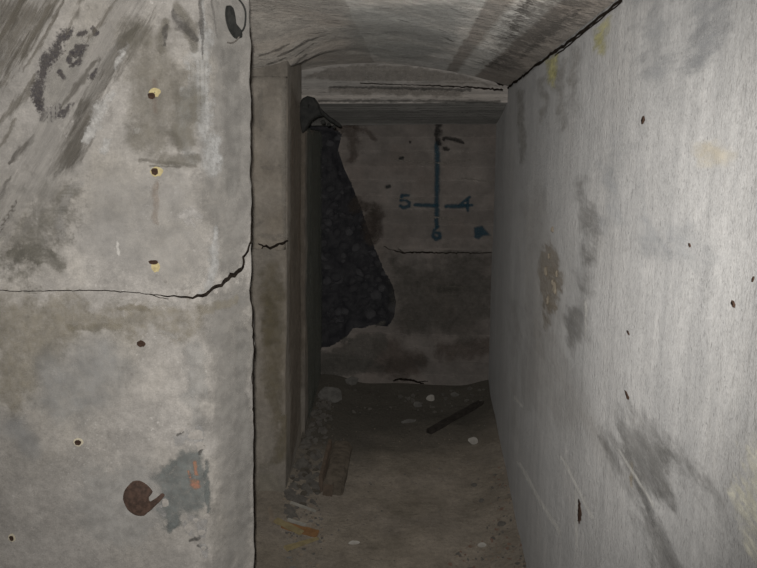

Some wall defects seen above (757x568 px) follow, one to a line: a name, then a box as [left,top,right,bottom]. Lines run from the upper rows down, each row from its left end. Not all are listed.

leakage [0,0,251,284]
crack [0,31,288,568]
leakage [208,287,255,568]
crack [384,246,492,254]
crack [360,0,622,91]